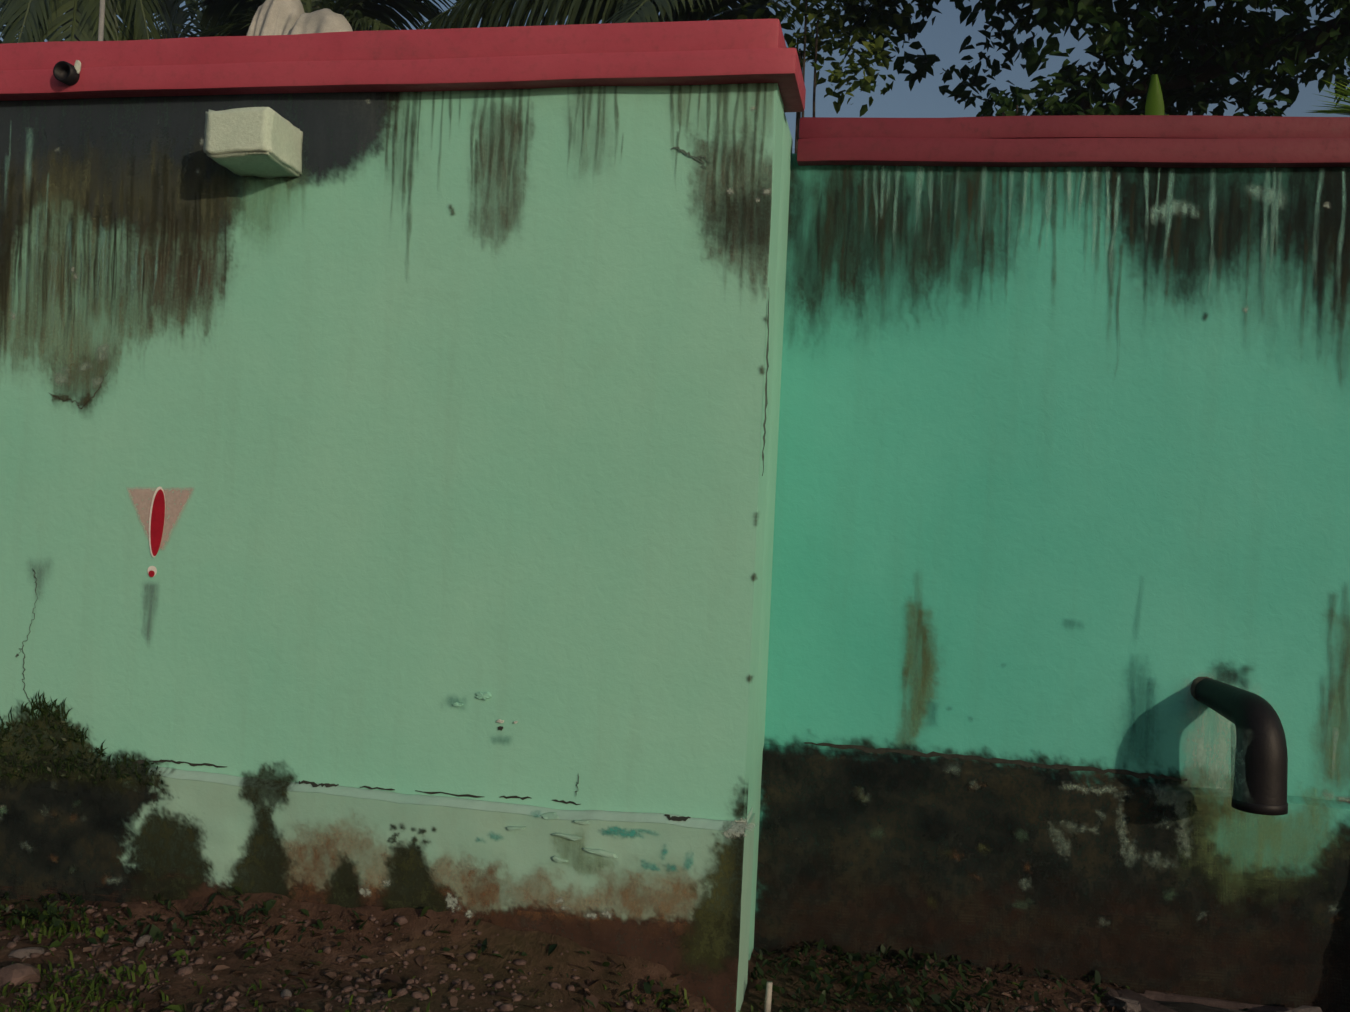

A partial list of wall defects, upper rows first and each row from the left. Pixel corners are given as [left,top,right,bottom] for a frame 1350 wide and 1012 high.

leakage [0,92,399,384]
leakage [697,140,772,282]
leakage [787,165,993,309]
leakage [1068,166,1350,305]
crack [15,568,40,704]
rust [907,606,934,736]
peeling [446,893,472,917]
peeling [606,827,650,837]
crack [665,813,691,821]
leakage [754,739,1350,1012]